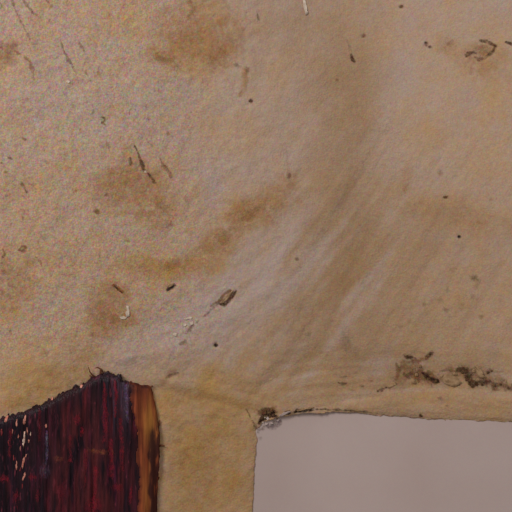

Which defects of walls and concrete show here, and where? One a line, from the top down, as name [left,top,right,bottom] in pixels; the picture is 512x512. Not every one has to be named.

flaking render [218,289,236,306]